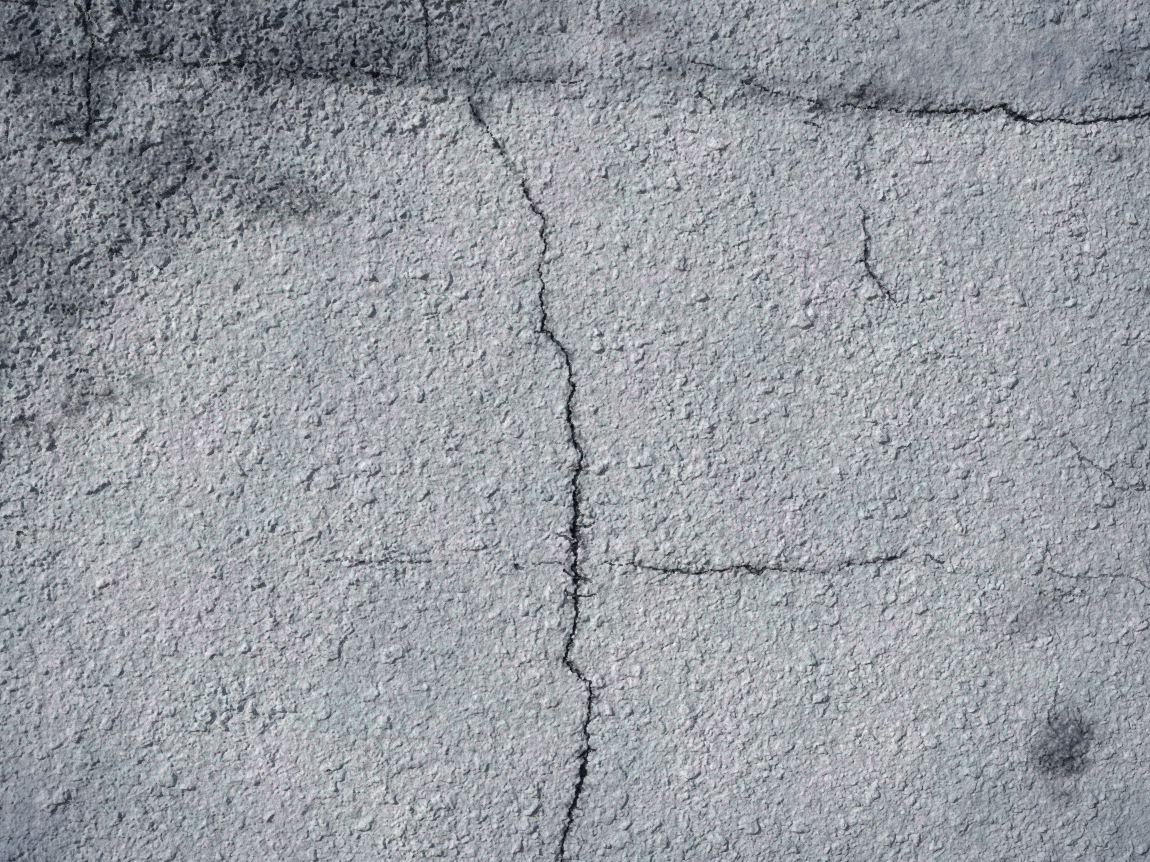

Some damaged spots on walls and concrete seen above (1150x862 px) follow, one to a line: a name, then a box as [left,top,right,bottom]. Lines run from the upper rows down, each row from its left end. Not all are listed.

crack [0,0,399,134]
damp [0,0,409,149]
crack [422,0,432,76]
crack [691,61,1150,128]
damp [113,101,219,215]
damp [0,196,60,282]
damp [44,280,82,327]
crack [466,81,945,862]
crack [1070,441,1150,492]
crack [312,556,432,565]
crack [1048,568,1150,624]
crack [1039,685,1104,765]